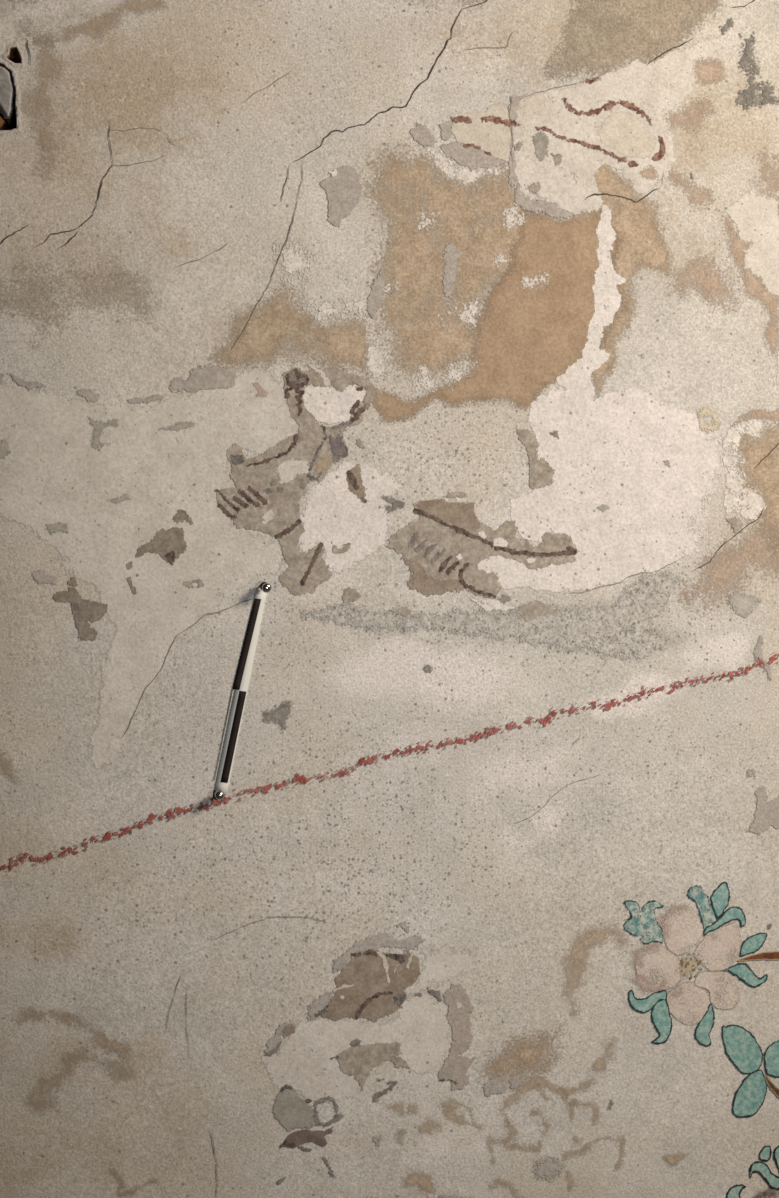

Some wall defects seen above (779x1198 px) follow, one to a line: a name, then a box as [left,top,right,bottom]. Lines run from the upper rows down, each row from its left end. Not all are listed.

spalling [0,42,25,138]
crack [0,119,178,247]
peeling [320,166,363,227]
crack [231,0,512,350]
peeling [409,94,575,231]
peeling [438,242,484,333]
peeling [128,364,237,404]
peeling [214,338,577,622]
peeling [722,419,767,533]
peeling [126,510,194,595]
peeling [264,921,476,1091]
peeling [331,1039,410,1102]